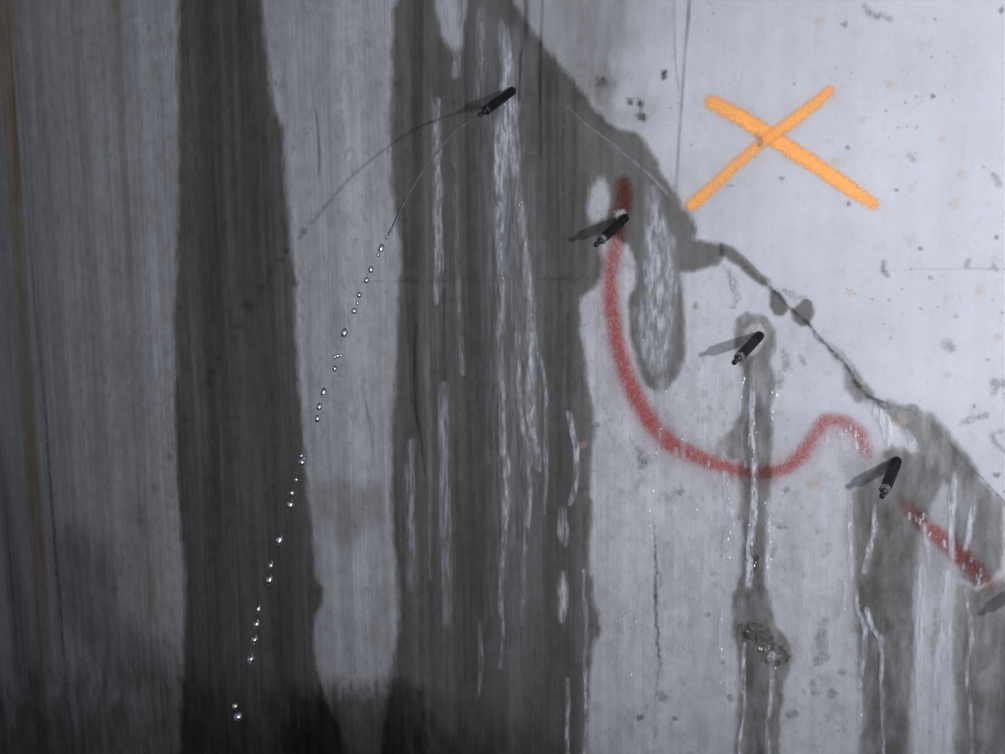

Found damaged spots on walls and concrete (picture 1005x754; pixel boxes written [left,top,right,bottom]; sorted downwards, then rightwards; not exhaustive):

water stain [495,42,516,232]
water stain [642,204,673,376]
water stain [518,333,534,388]
crack [807,322,874,399]
water stain [502,437,510,530]
water stain [741,373,771,587]
water stain [949,482,975,557]
water stain [856,597,883,681]
water stain [916,570,924,691]